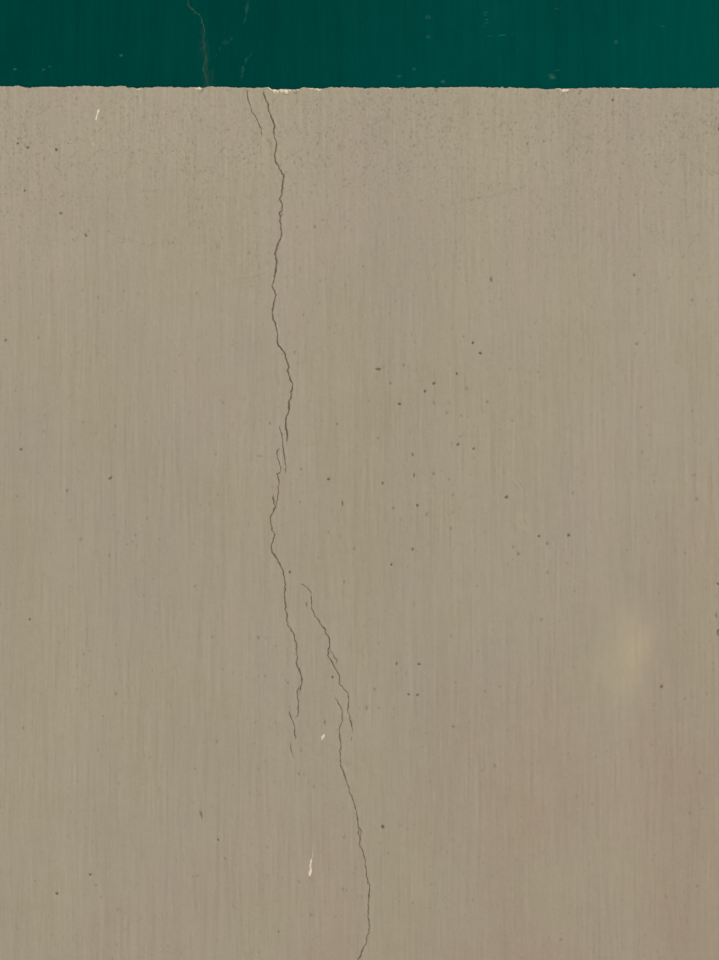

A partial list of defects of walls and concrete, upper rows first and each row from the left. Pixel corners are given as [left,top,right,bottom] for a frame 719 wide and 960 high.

crack [245,88,370,960]